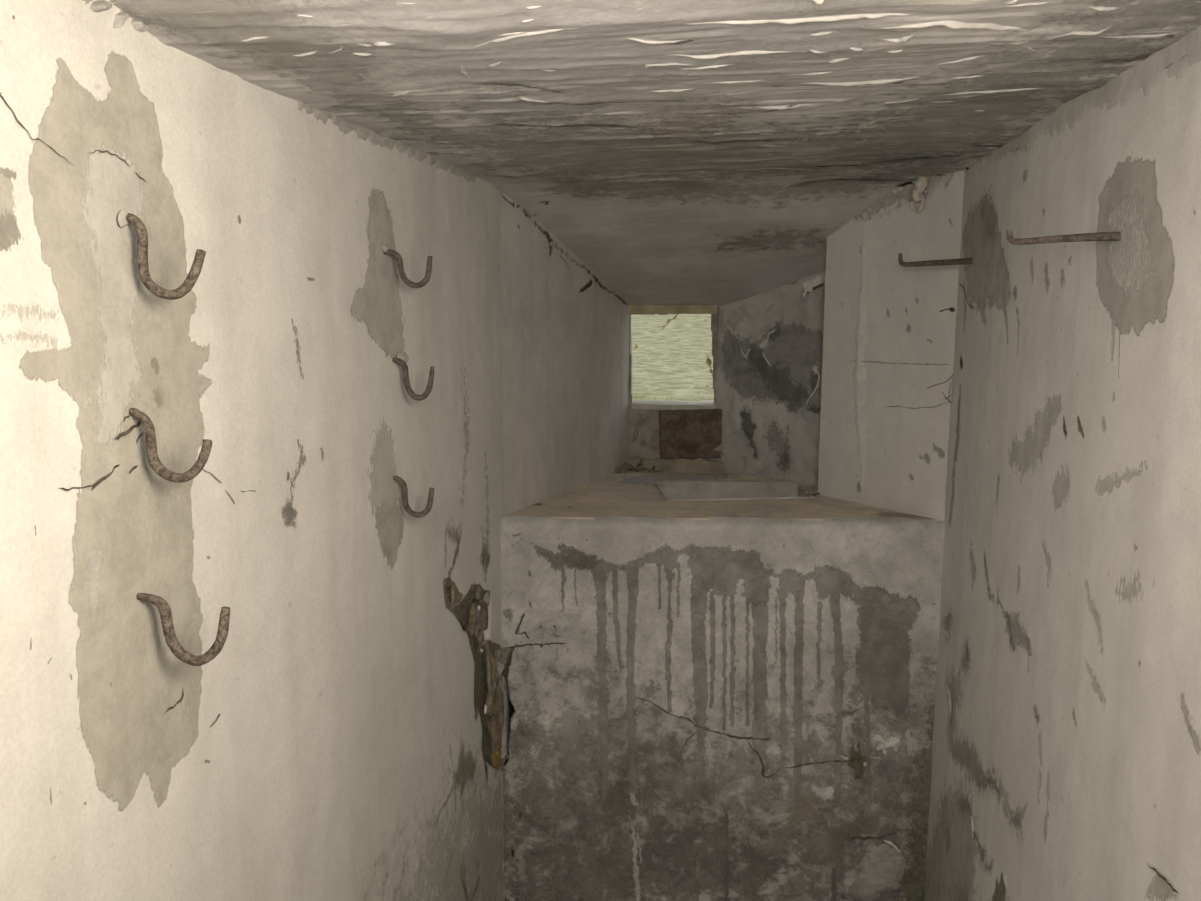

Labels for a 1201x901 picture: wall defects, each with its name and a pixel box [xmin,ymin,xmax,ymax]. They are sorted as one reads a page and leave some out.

crack [0,92,146,181]
flaking render [802,274,825,297]
leakage [739,406,796,476]
spalling [438,577,517,819]
leakage [393,542,936,901]
crack [635,697,848,779]